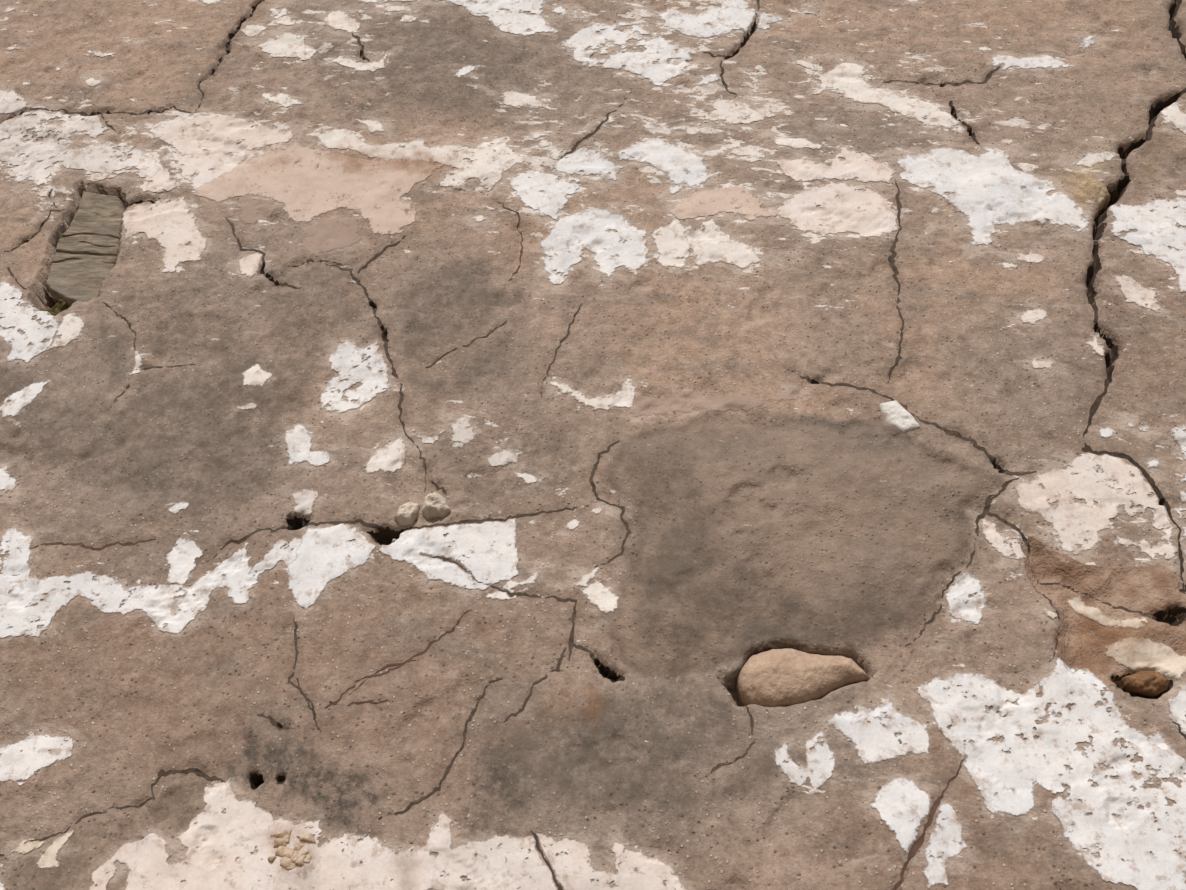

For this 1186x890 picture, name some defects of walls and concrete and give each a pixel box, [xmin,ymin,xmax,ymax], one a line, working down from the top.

crack [0,0,264,130]
peeling [448,0,790,86]
peeling [0,90,1089,284]
peeling [1109,196,1186,292]
peeling [0,489,543,638]
crack [226,218,447,494]
crack [207,440,631,568]
crack [792,181,1155,662]
crack [1081,88,1186,621]
crack [378,556,594,819]
peeling [774,452,1186,890]
peeling [90,778,686,890]